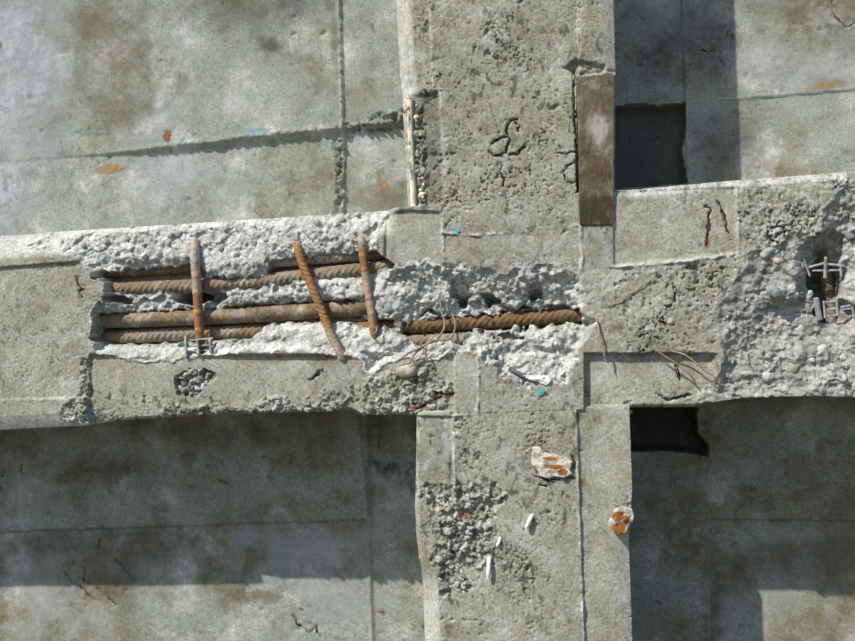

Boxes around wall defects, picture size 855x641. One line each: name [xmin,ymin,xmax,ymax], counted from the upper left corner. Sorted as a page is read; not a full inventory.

crack [490,118,526,186]
crack [557,73,578,194]
spalling [25,211,599,397]
spalling [694,171,855,405]
crack [64,539,136,606]